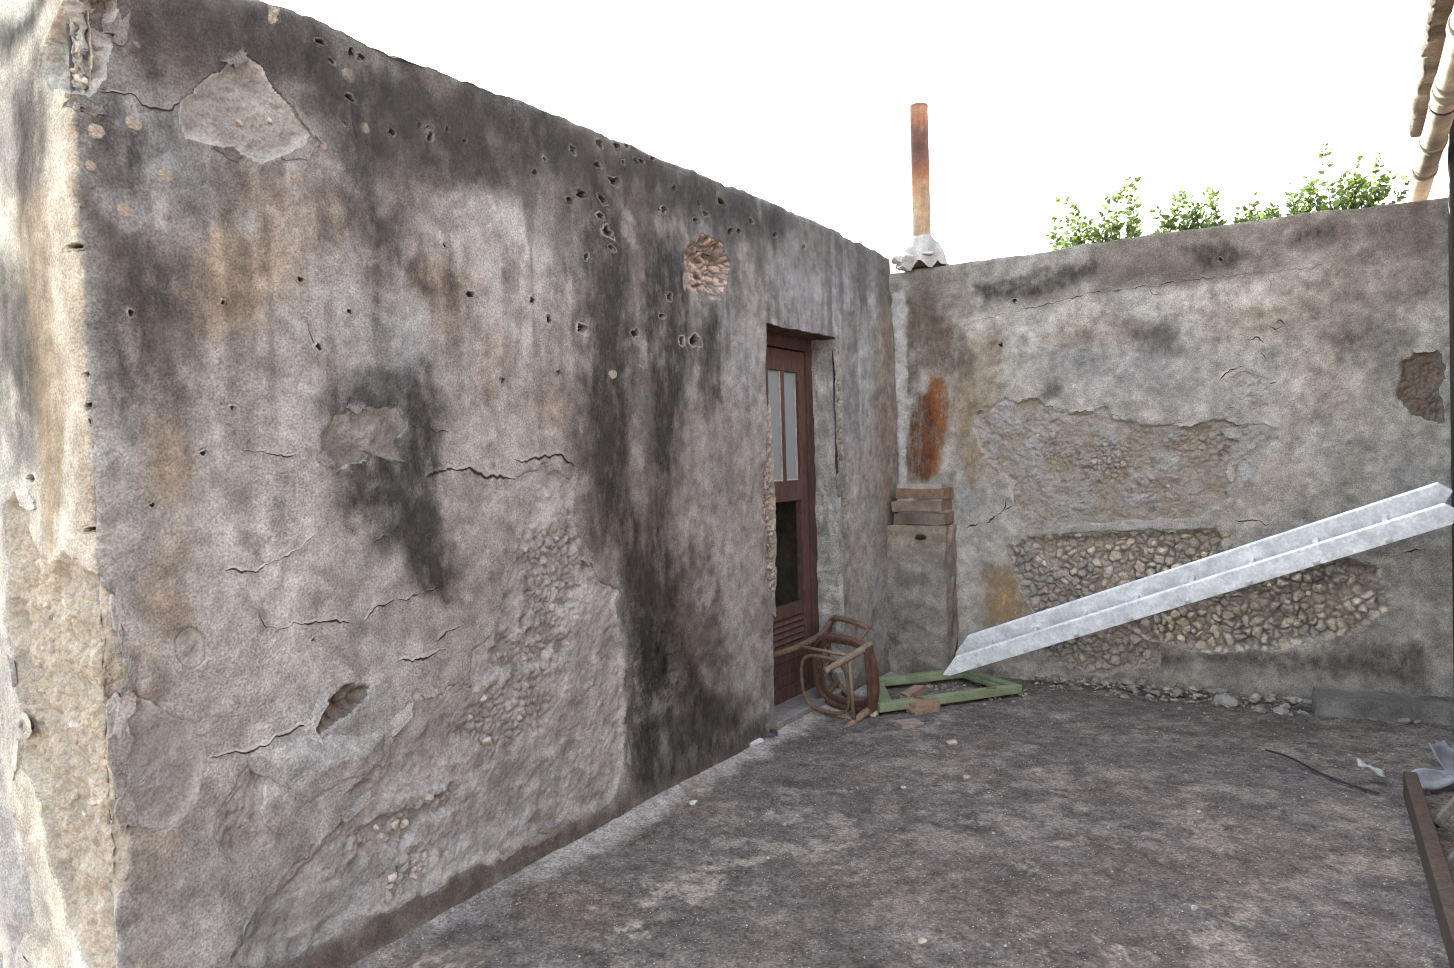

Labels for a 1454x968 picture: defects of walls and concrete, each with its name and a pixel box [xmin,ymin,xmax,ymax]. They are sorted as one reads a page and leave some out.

leakage [105,129,147,169]
leakage [114,258,170,385]
crack [225,532,317,574]
crack [258,582,448,639]
crack [410,424,575,482]
leakage [243,11,784,792]
corrosion [907,376,979,479]
flaking render [973,398,1291,613]
flaking render [1041,557,1390,678]
flaking render [5,486,208,968]
crack [209,721,310,758]
flaking render [232,461,631,968]